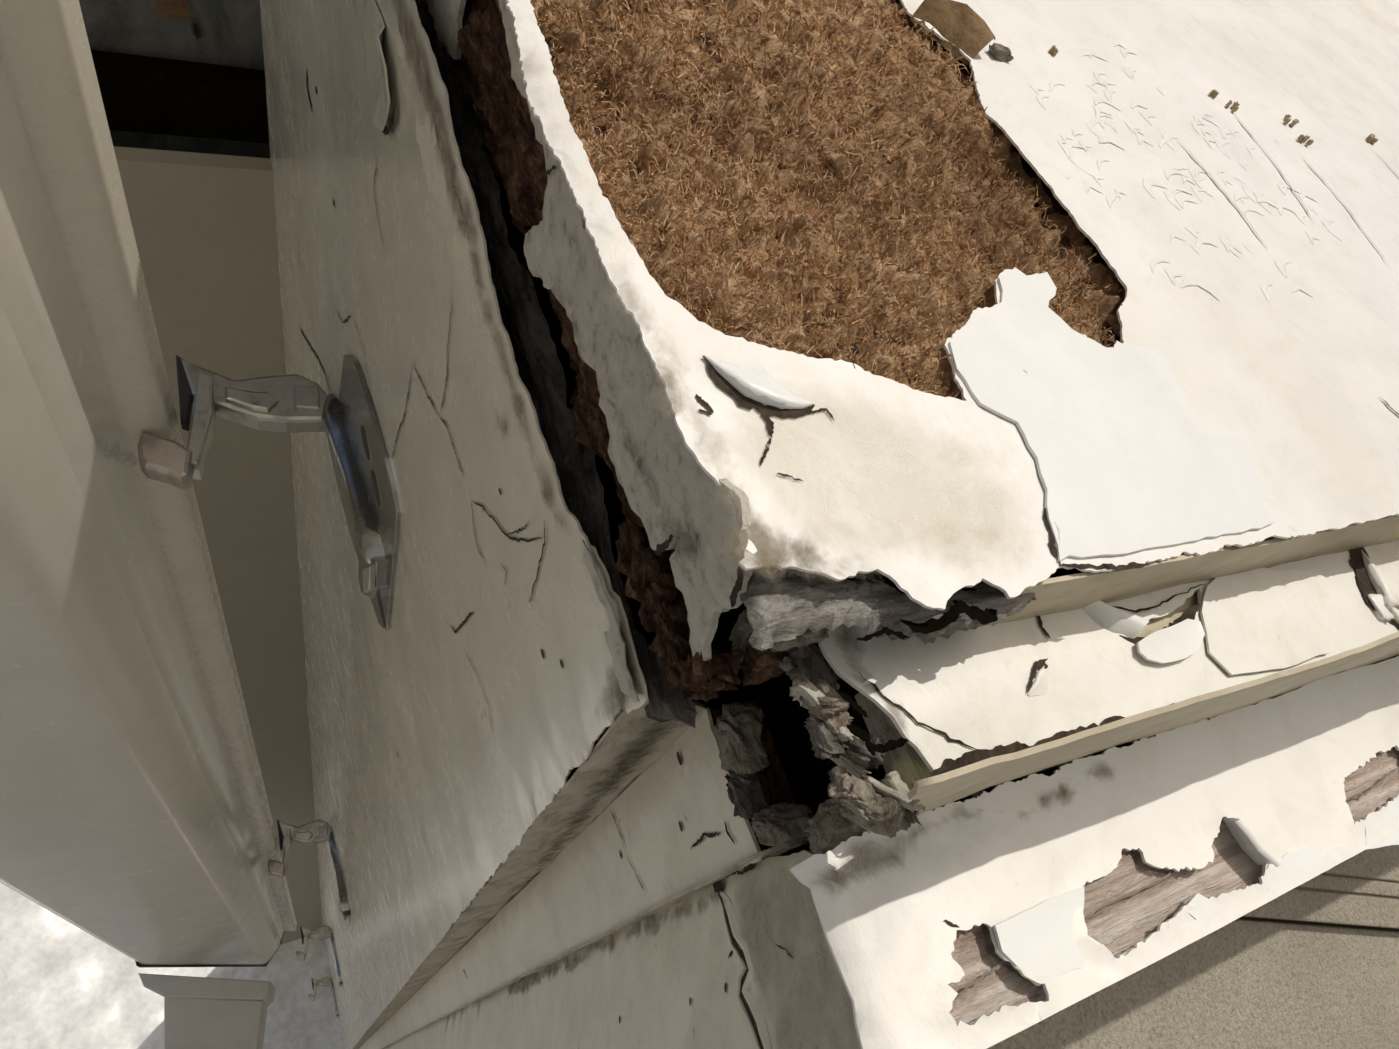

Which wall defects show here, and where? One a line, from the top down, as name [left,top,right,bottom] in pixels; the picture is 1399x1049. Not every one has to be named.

crack [537,165,556,179]
peeling [531,0,1274,562]
crack [391,296,545,601]
crack [695,355,834,482]
crack [655,534,673,556]
crack [729,566,744,608]
peeling [740,567,1036,651]
peeling [1082,567,1331,676]
peeling [1367,594,1396,622]
crack [610,810,645,892]
crack [691,821,795,1049]
peeling [948,747,1399,1024]